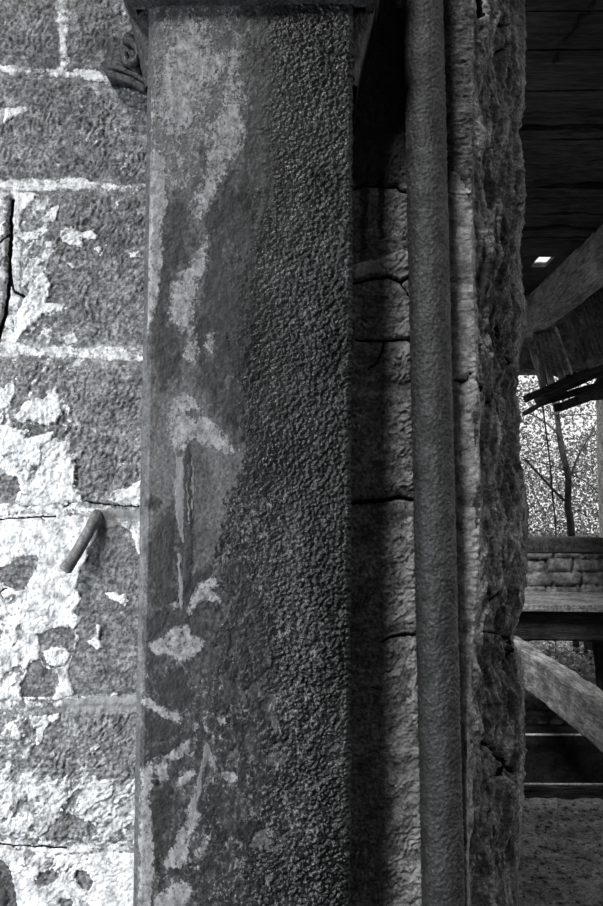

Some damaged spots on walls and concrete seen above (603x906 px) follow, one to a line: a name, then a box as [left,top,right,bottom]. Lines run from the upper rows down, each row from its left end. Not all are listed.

crack [0,199,26,341]
damp [147,185,224,397]
crack [0,500,140,521]
damp [142,440,215,643]
crack [381,633,416,643]
damp [154,667,193,711]
damp [139,714,181,767]
crack [0,842,67,850]
damp [150,782,173,876]